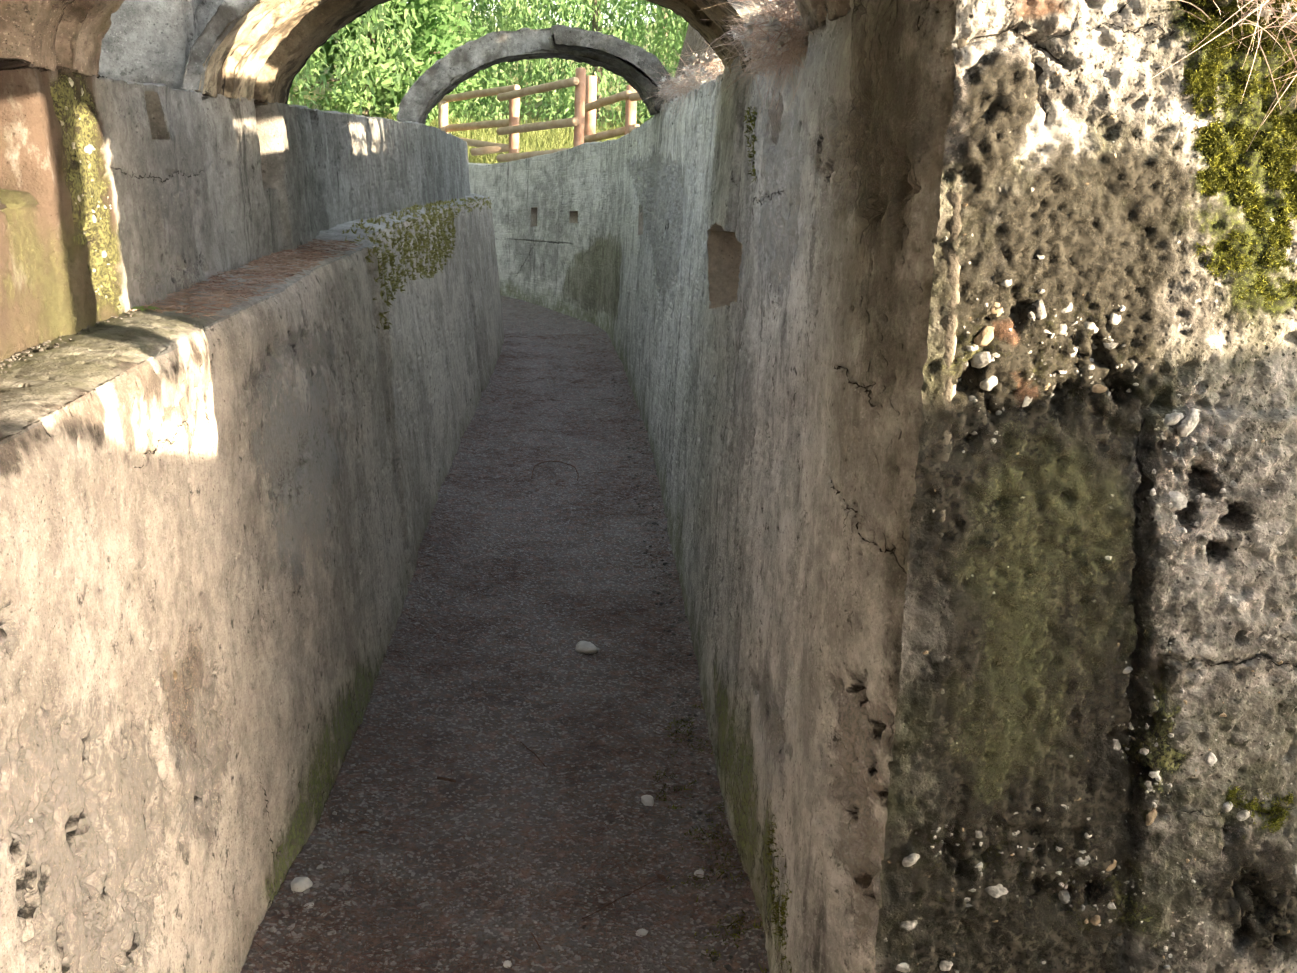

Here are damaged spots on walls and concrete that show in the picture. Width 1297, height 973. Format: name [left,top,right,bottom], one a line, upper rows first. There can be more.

water stain [850,0,933,402]
water stain [266,654,385,903]
water stain [714,658,786,973]
water stain [875,0,1297,973]
crack [1120,418,1297,786]